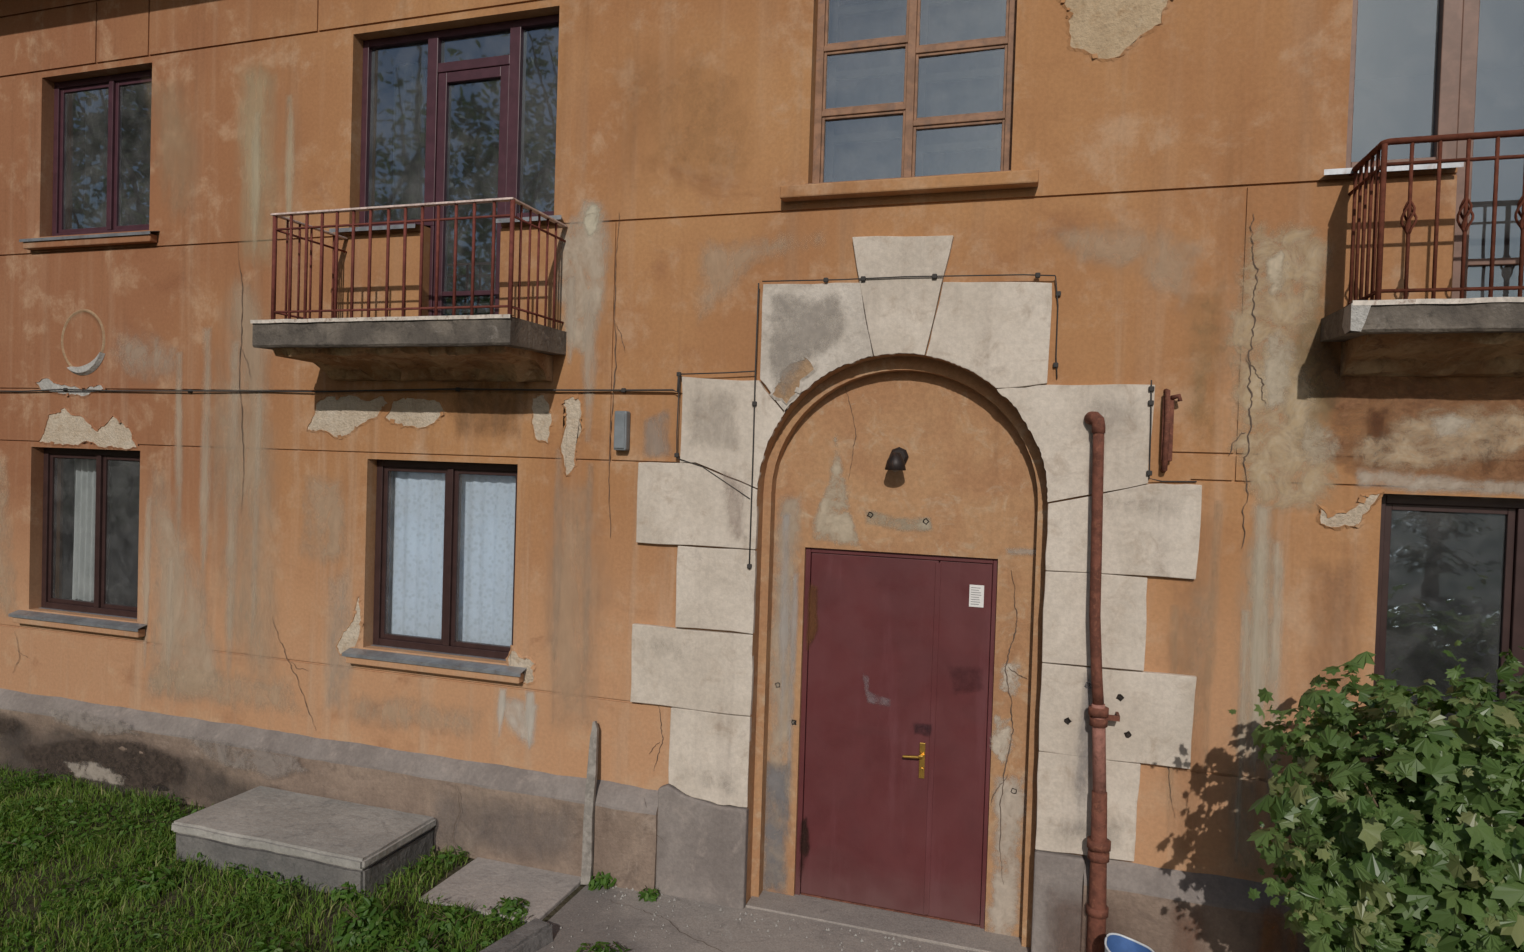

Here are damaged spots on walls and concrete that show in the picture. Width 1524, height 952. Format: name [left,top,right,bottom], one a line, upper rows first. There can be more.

peeling [1057,0,1171,62]
peeling [584,204,600,236]
peeling [1266,251,1285,295]
peeling [35,376,138,451]
peeling [306,393,447,440]
peeling [530,393,585,477]
crack [1229,214,1266,549]
water stain [1354,407,1524,493]
water stain [1226,226,1342,862]
peeling [1316,489,1385,531]
crack [991,571,1027,880]